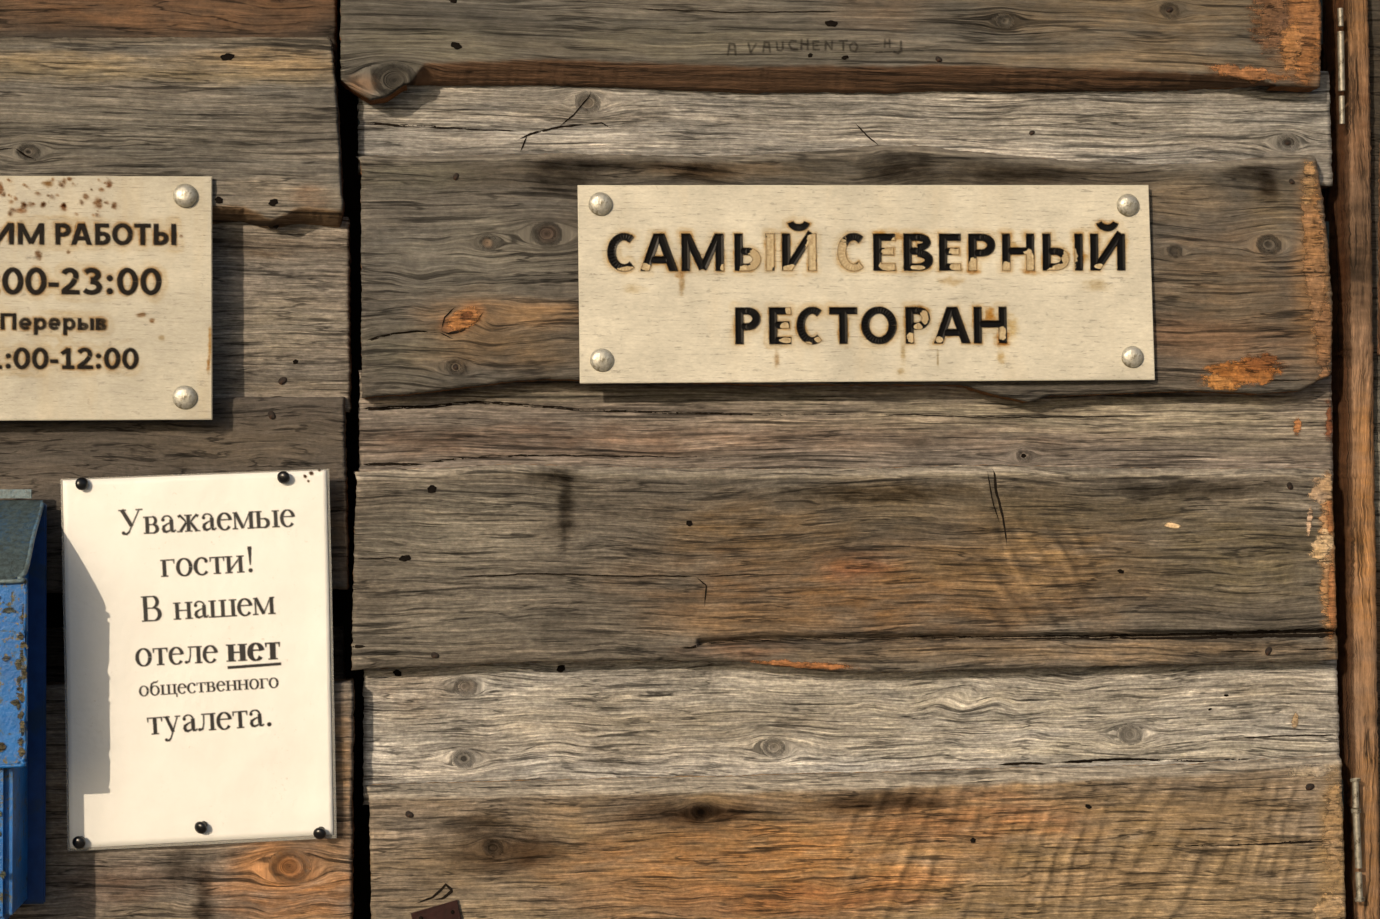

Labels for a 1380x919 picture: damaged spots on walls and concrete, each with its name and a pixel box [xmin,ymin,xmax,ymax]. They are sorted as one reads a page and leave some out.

peeling [1210,0,1321,86]
crack [365,92,608,150]
peeling [1203,353,1282,391]
peeling [1307,472,1337,639]
crack [681,628,1336,652]